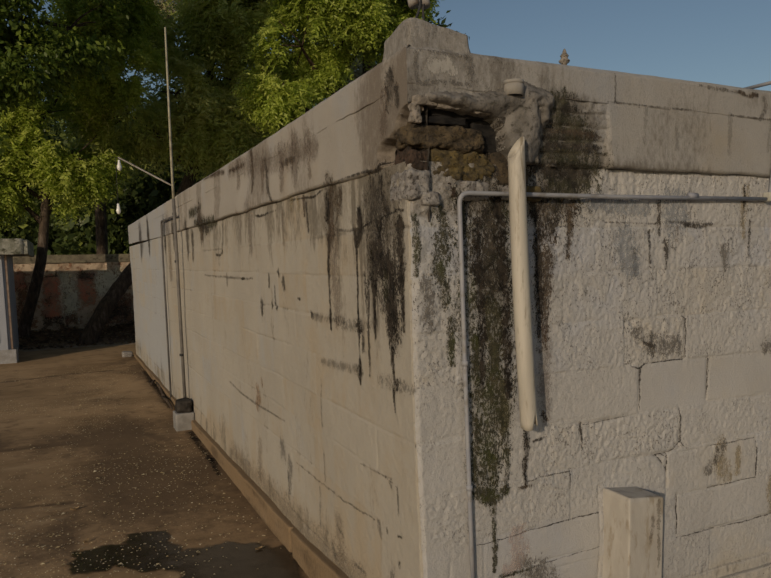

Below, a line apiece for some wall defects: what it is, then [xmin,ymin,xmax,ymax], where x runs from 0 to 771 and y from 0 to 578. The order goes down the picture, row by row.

spalling [390,49,509,222]
spalling [526,165,549,202]
damp [323,172,342,331]
peeling [57,267,124,327]
peeling [105,297,135,326]
damp [353,162,436,406]
damp [446,316,456,367]
damp [456,175,537,578]
damp [520,430,545,490]